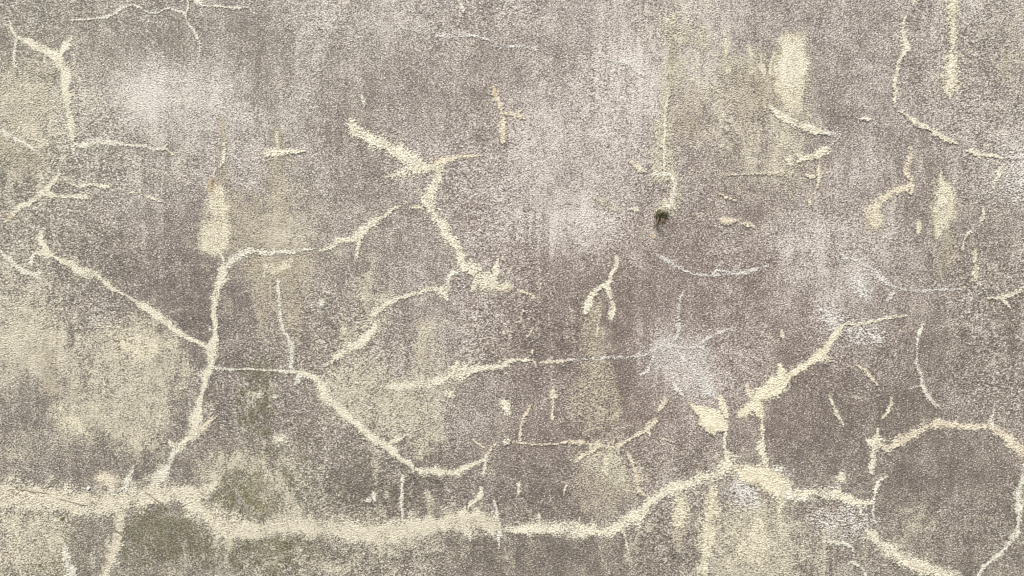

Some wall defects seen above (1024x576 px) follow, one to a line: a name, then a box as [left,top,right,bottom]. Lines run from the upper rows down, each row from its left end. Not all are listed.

crack [0,0,256,223]
crack [491,84,526,144]
crack [591,85,684,220]
crack [861,0,1024,252]
crack [0,117,1024,576]